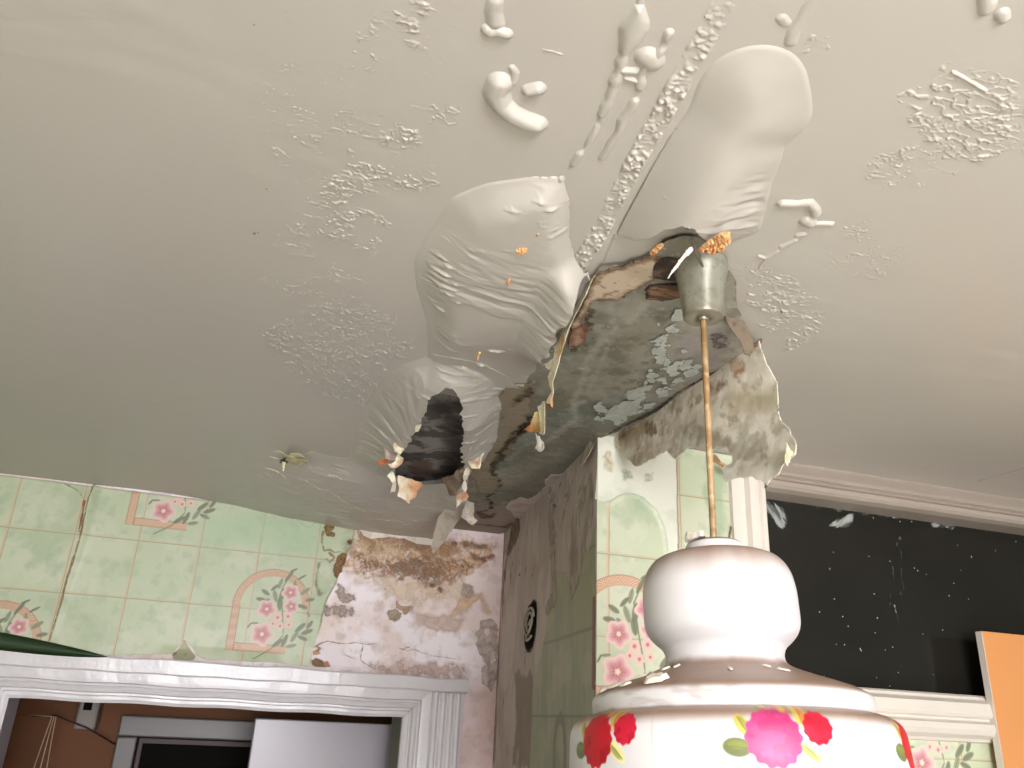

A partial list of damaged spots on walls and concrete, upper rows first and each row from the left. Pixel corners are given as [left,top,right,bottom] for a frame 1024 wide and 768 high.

spalling [650,243,678,281]
spalling [698,231,731,255]
water stain [711,334,727,348]
water stain [477,416,532,519]
flaking render [578,436,705,553]
water stain [547,465,593,614]
flaking render [311,644,369,669]
peeling [475,619,499,692]